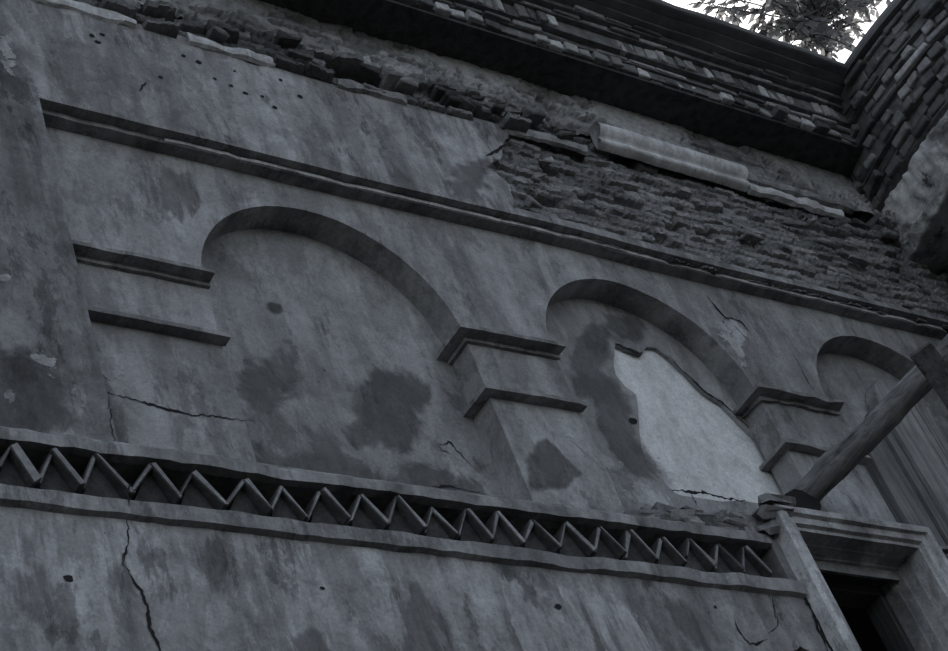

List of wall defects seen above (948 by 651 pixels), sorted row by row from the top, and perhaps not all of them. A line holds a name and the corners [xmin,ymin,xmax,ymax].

peeling [0,36,16,87]
flaking render [489,134,948,328]
crack [706,295,748,330]
crack [108,392,255,441]
damp [255,370,485,495]
damp [572,315,663,478]
crack [670,489,747,505]
crack [122,483,161,651]